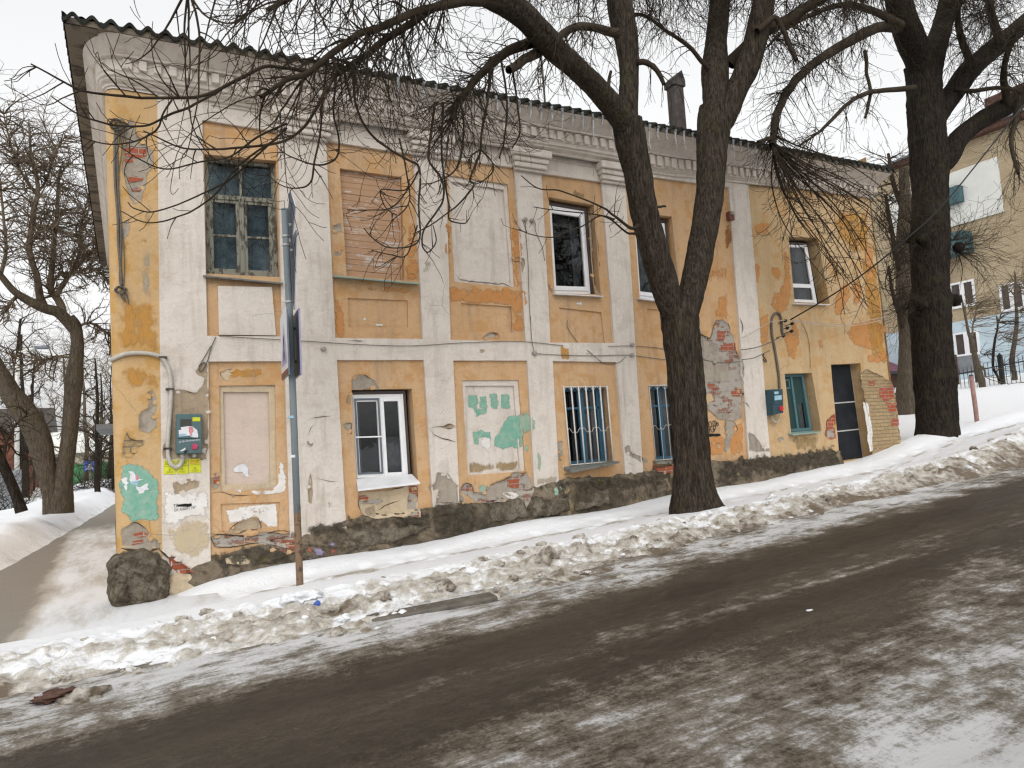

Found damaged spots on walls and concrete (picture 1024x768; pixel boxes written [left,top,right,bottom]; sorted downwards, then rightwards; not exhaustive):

spalling [121,119,154,204]
peeling [122,390,160,458]
peeling [346,375,380,404]
spalling [701,320,784,452]
spalling [825,414,836,439]
spalling [860,369,901,454]
spalling [358,471,534,519]
spalling [121,522,194,574]
spalling [211,517,295,565]